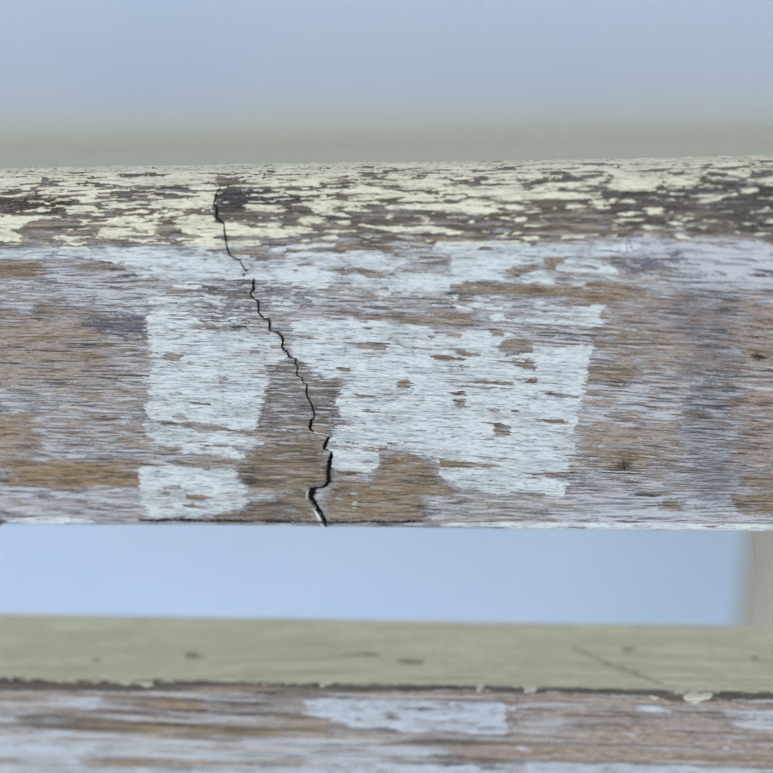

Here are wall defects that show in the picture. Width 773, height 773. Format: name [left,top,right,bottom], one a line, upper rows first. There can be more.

crack [213,184,333,527]
peeling [0,155,773,523]
peeling [0,677,773,773]